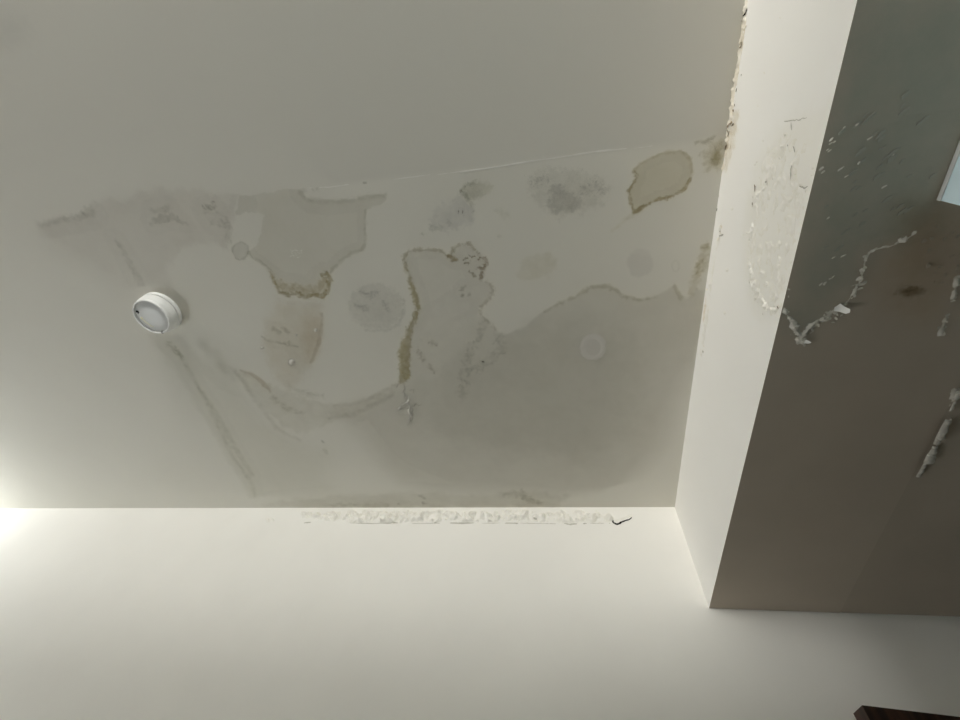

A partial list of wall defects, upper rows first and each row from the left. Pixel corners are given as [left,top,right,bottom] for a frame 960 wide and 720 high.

peeling [721,0,748,176]
peeling [782,231,917,347]
peeling [916,388,960,478]
peeling [301,509,613,525]